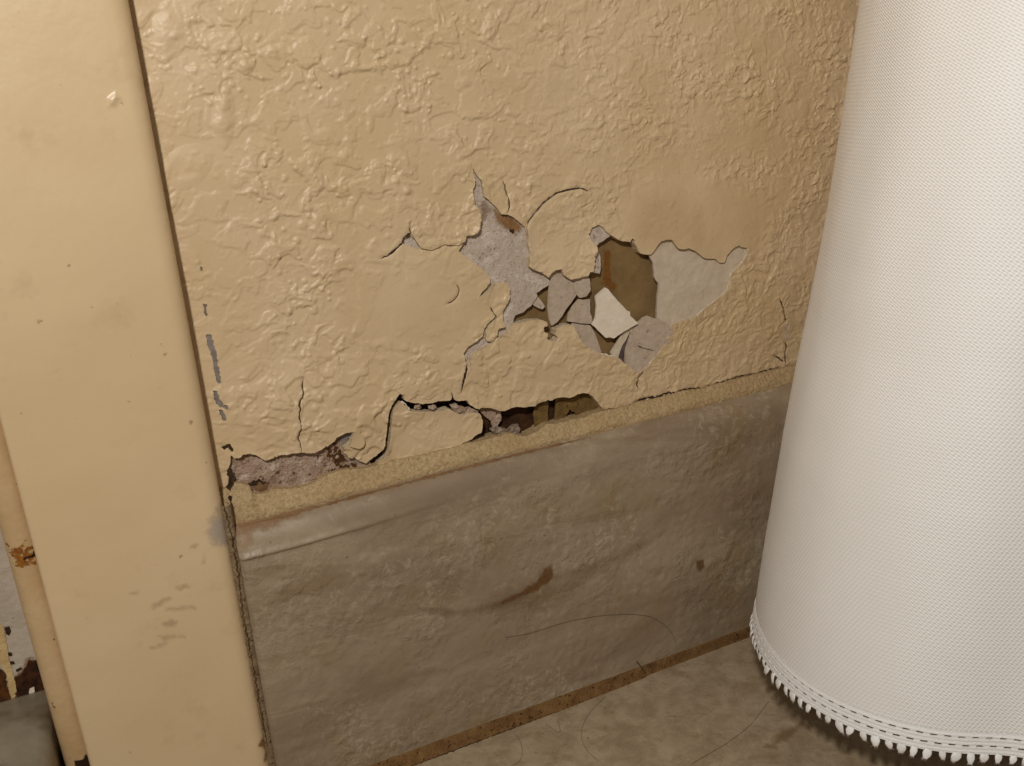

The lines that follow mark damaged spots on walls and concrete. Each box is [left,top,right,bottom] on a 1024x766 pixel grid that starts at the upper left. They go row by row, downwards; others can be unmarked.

peeling [459,173,746,372]
crack [297,381,305,447]
flaking render [227,393,598,492]
corrosion [6,540,36,568]